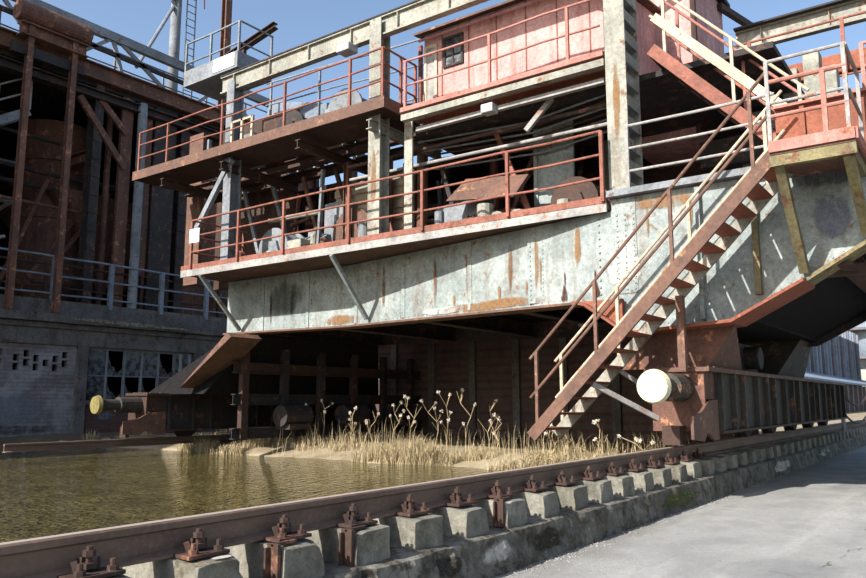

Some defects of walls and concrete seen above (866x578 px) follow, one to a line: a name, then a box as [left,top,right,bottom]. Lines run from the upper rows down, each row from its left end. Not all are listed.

rust [452,242,541,312]
leakage [485,542,510,564]